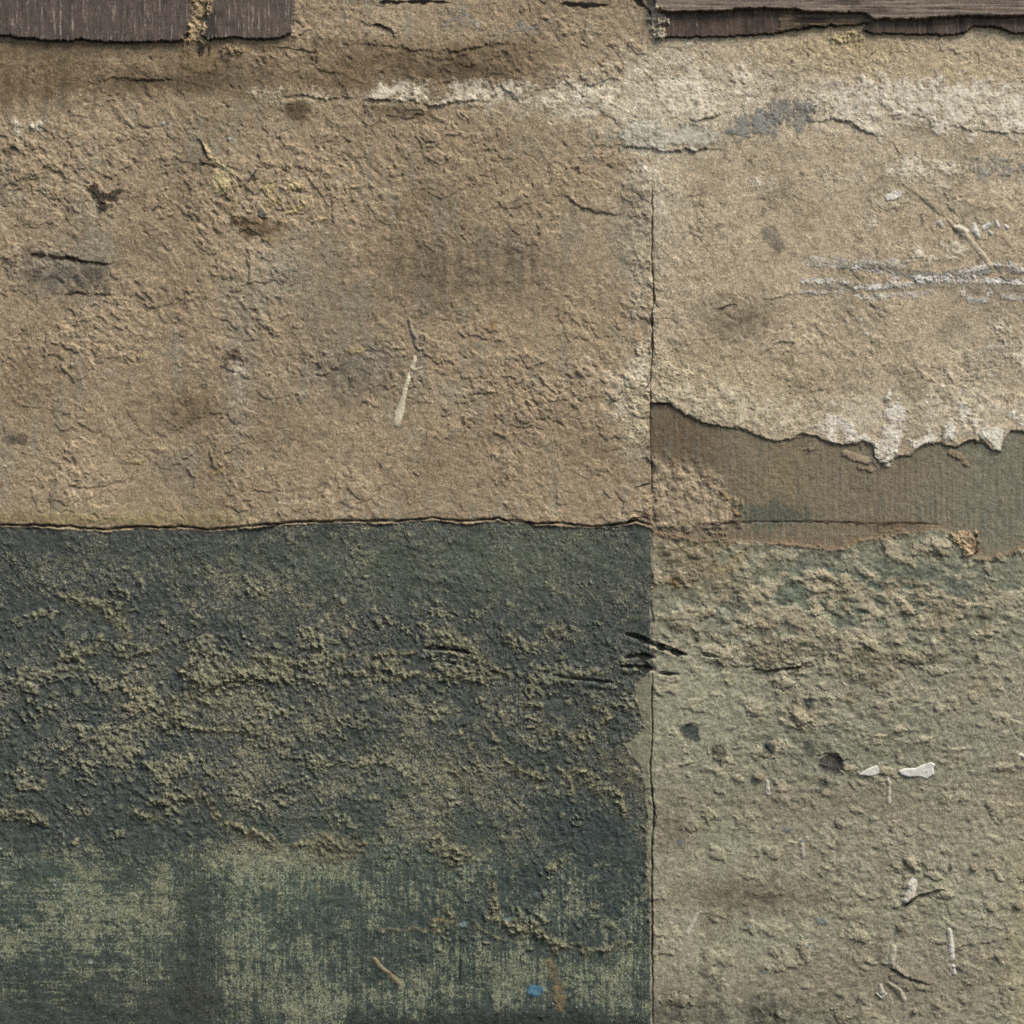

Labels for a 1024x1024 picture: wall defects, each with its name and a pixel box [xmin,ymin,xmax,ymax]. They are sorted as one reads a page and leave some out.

crack [30,253,107,264]
crack [65,289,110,297]
crack [636,187,671,488]
crack [0,516,649,531]
spalling [651,403,1024,561]
crack [649,687,657,1010]